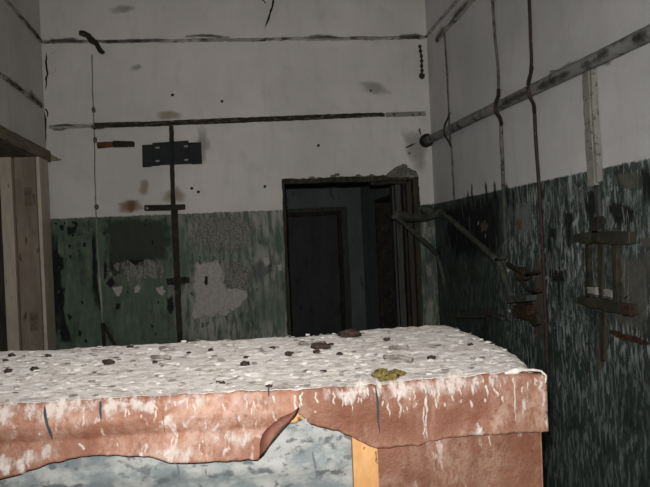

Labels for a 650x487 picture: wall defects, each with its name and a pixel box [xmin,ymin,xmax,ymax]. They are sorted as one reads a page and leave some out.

flaking render [386,164,420,213]
peeling [0,186,527,402]
rust [610,330,649,345]